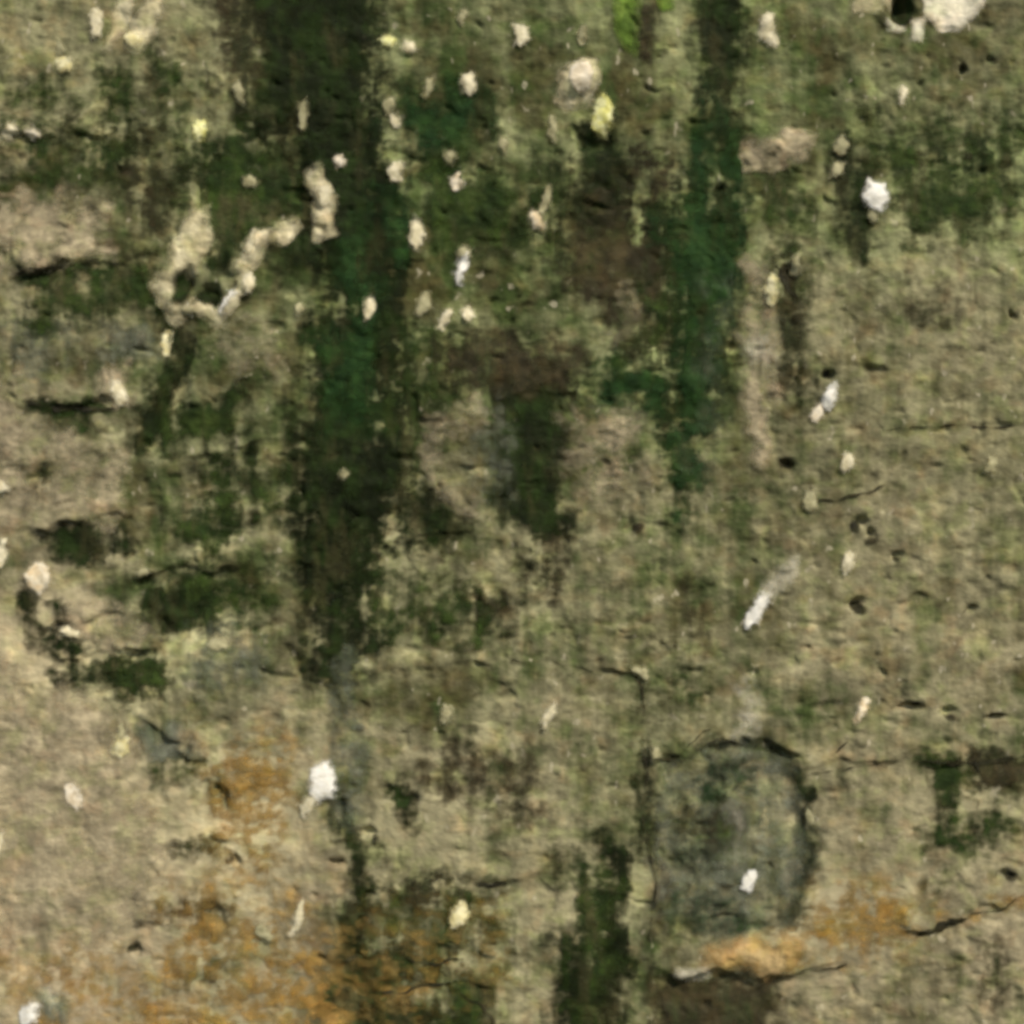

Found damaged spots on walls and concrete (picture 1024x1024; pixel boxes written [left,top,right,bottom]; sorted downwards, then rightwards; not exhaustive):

spalling [854,0,985,39]
peeling [741,128,815,172]
spalling [152,82,337,356]
leakage [128,0,754,774]
peeling [741,261,780,464]
leakage [385,728,541,827]
leakage [629,747,654,802]
leakage [544,817,675,1024]
rust [813,890,907,953]
crack [918,900,1014,936]
rust [198,952,347,1024]
crack [798,964,847,975]